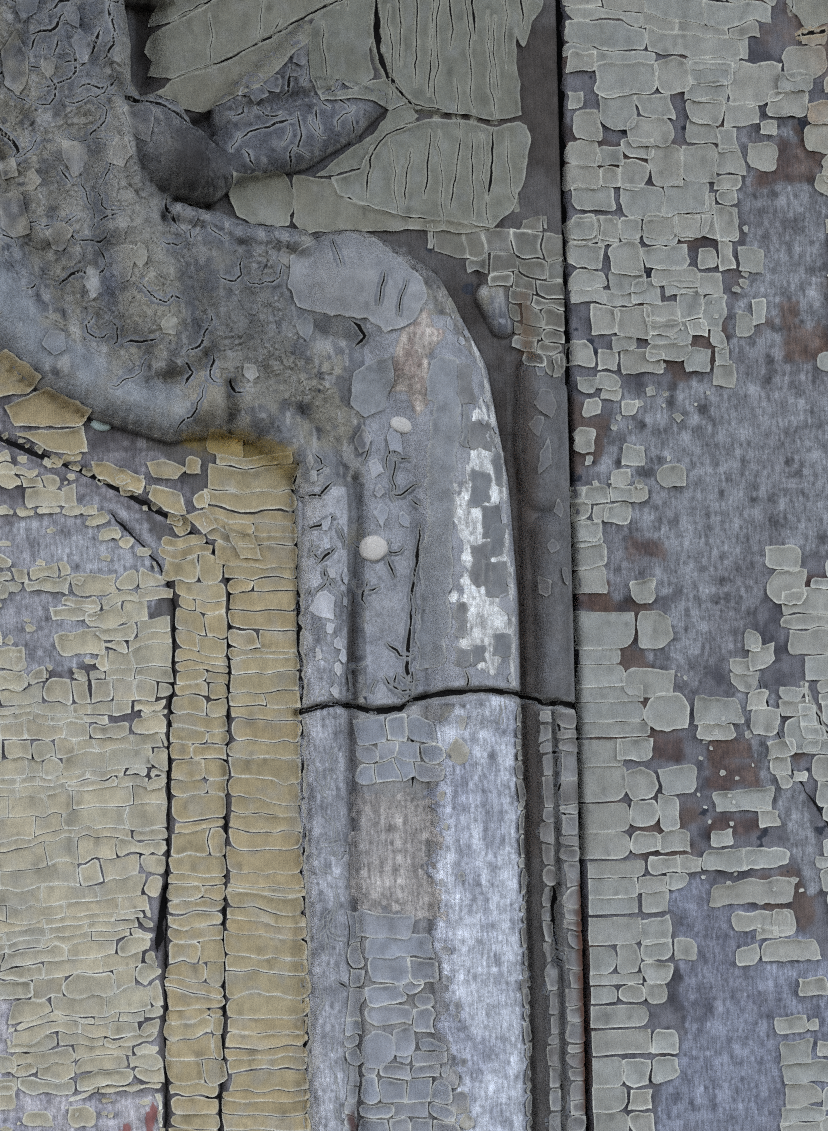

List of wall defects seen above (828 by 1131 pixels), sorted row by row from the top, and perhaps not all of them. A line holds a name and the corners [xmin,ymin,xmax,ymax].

peeling [0,157,42,238]
peeling [1,0,57,95]
peeling [62,140,88,177]
peeling [63,3,93,63]
peeling [83,242,148,300]
crack [0,436,231,1131]
peeling [0,349,532,1131]
crack [0,0,571,475]
peeling [144,0,595,670]
crack [288,435,589,1131]
peeling [538,711,561,1131]
peeling [554,0,828,1131]